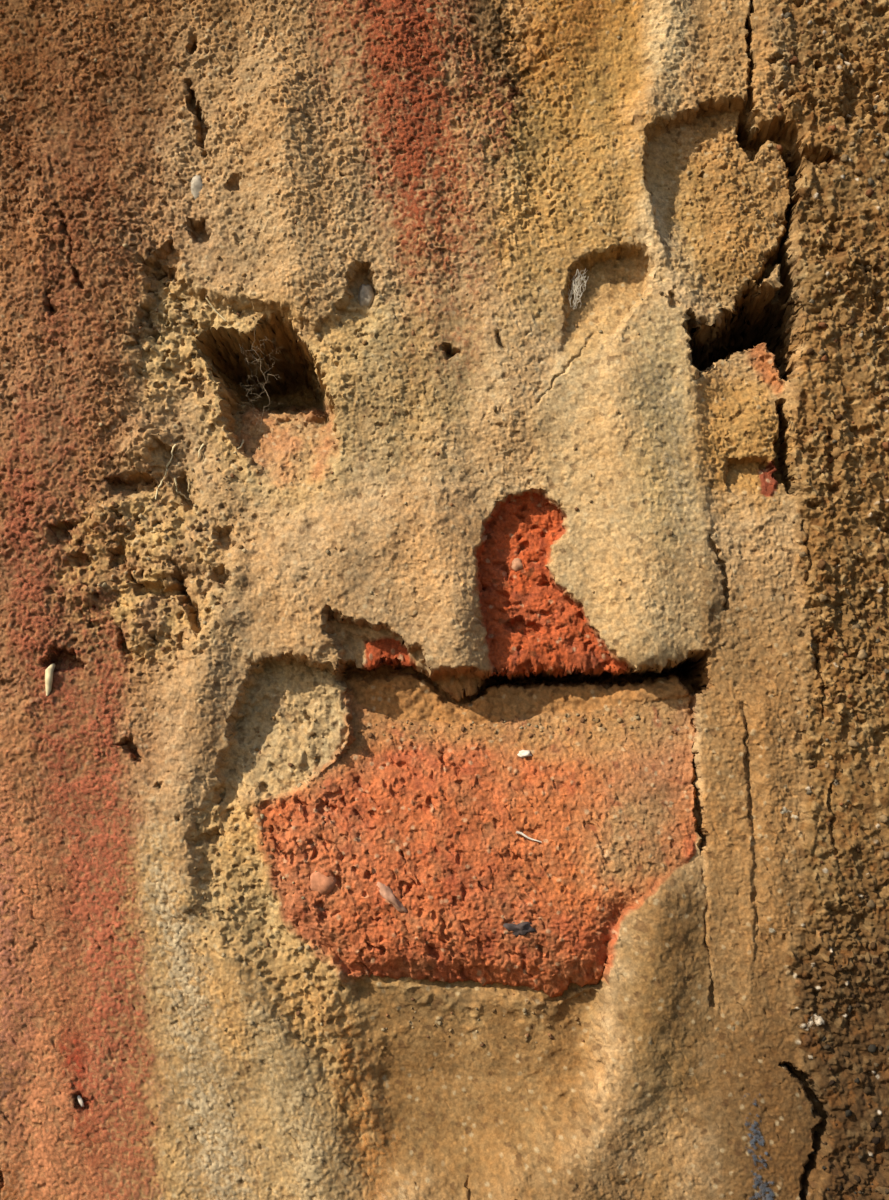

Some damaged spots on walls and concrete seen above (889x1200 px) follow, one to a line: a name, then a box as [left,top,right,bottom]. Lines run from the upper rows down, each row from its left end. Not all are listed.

crack [736,0,842,349]
spalling [193,310,344,493]
crack [770,400,814,588]
spalling [212,486,715,843]
spalling [503,922,536,937]
crack [689,692,719,1011]
crack [778,1062,835,1200]